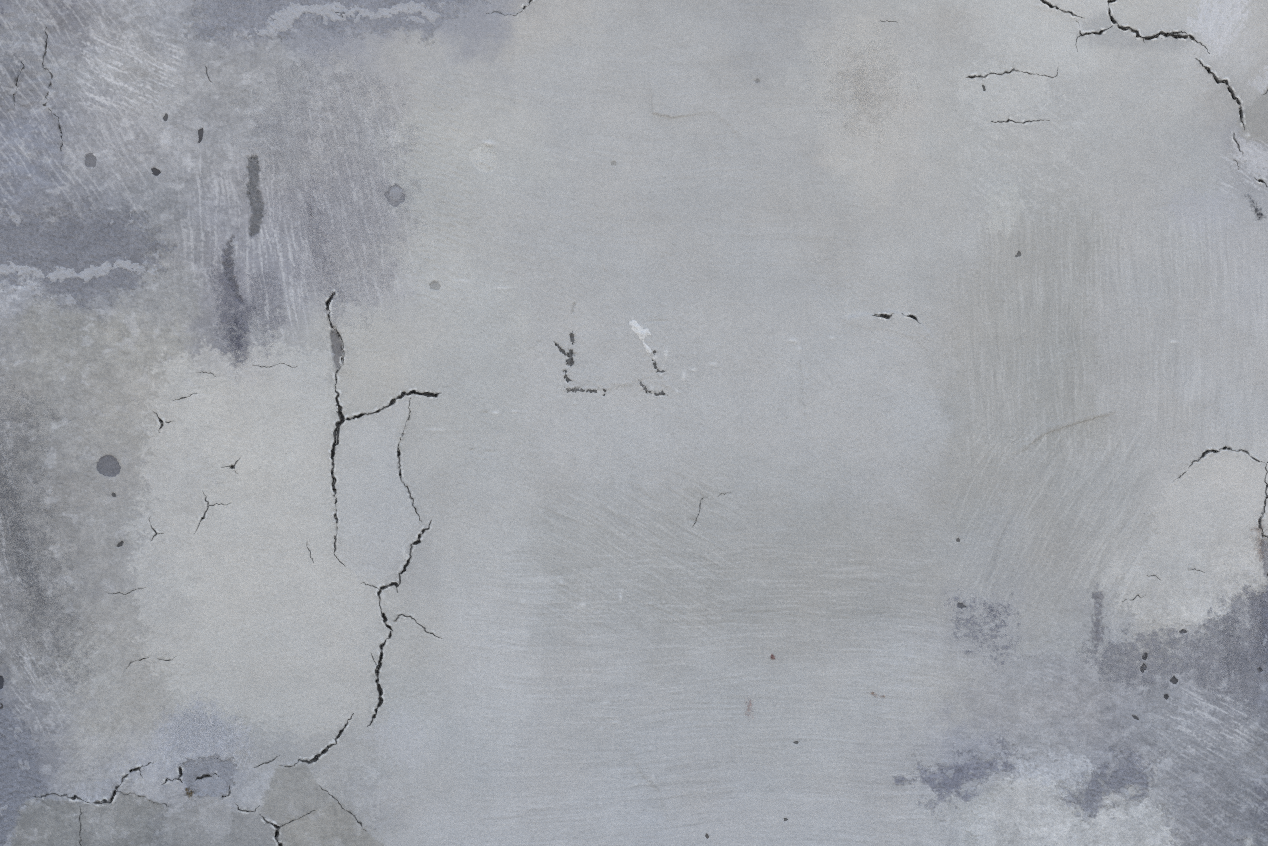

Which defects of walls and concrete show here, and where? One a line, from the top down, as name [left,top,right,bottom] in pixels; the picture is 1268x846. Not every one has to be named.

flaking render [174,0,491,58]
crack [968,0,1268,186]
spalling [84,153,97,168]
flaking render [0,195,178,319]
crack [874,312,921,324]
crack [1179,447,1268,540]
crack [33,289,439,846]
flaking render [1088,583,1108,648]
flaking render [1256,537,1268,672]
flaking render [892,730,1028,829]
flaking render [1056,736,1165,823]